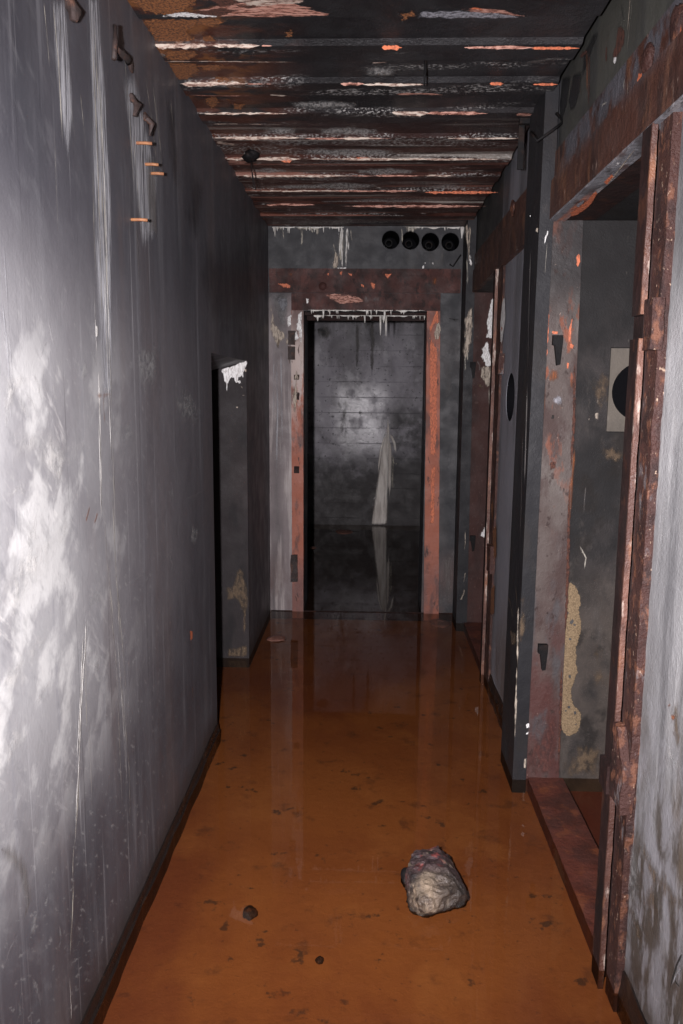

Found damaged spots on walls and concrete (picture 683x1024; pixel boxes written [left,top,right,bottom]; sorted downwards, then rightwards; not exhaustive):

corrosion [133,0,256,80]
water stain [272,227,352,269]
water stain [402,226,471,244]
water stain [311,310,425,369]
peeling [464,309,472,360]
corrosion [550,363,576,630]
spalling [561,582,581,736]